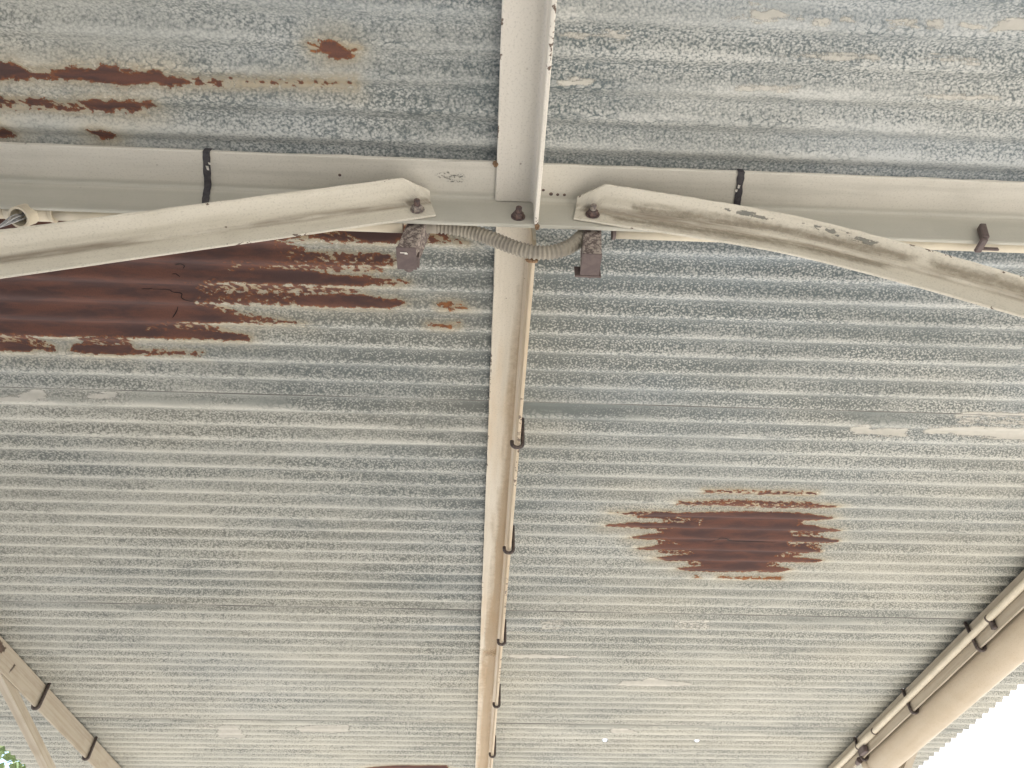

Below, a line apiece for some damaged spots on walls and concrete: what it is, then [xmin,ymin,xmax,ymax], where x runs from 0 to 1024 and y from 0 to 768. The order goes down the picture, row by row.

rust [307,39,361,61]
rust [0,61,356,114]
rust [427,233,468,244]
rust [0,223,409,357]
rust [427,301,468,329]
rust [606,489,840,581]